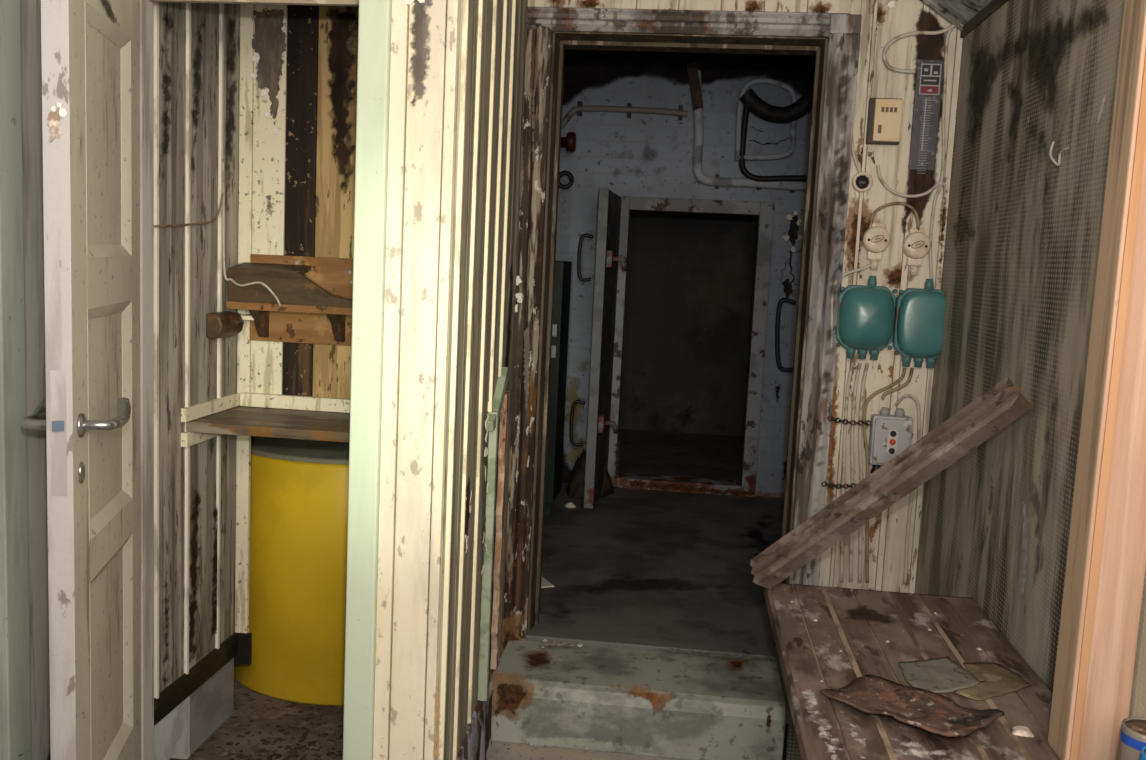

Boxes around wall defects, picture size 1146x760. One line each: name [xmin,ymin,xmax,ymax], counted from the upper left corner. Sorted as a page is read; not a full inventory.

rust [579,0,604,8]
rust [745,0,763,17]
rust [810,2,831,13]
peeling [251,5,286,135]
damp [968,10,1106,173]
rust [845,201,871,278]
rust [489,614,550,727]
rust [618,685,672,714]